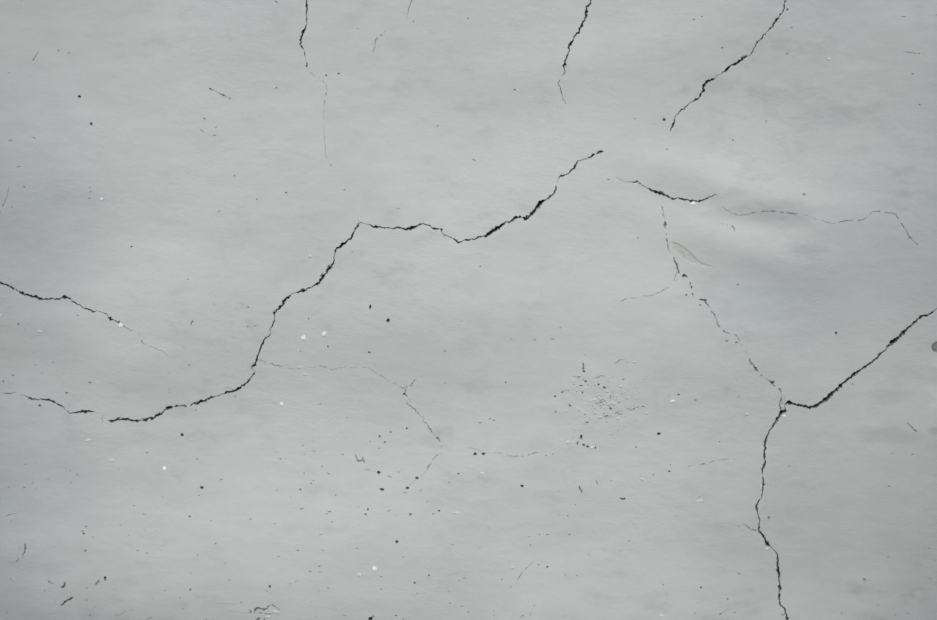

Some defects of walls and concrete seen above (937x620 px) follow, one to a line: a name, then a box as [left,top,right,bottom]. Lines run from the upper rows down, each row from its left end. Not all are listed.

crack [299,0,340,105]
crack [558,0,591,103]
crack [663,0,788,131]
crack [0,150,604,489]
crack [621,180,937,620]